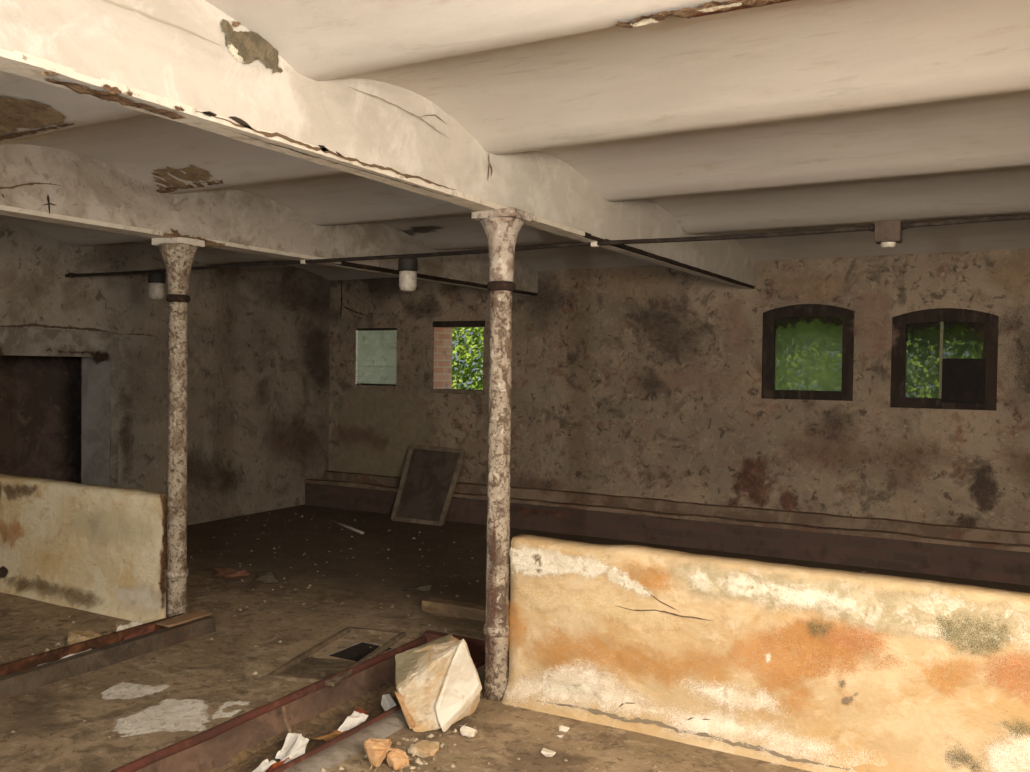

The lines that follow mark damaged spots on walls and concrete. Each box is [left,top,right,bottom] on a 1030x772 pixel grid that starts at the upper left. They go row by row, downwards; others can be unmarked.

flaking render [614,0,793,28]
flaking render [220,19,283,74]
flaking render [38,71,185,119]
flaking render [0,95,74,145]
flaking render [152,165,224,193]
water stain [2,483,38,501]
water stain [0,566,163,617]
water stain [614,559,681,599]
crack [605,573,711,621]
water stain [501,600,1030,772]
crack [537,700,850,770]